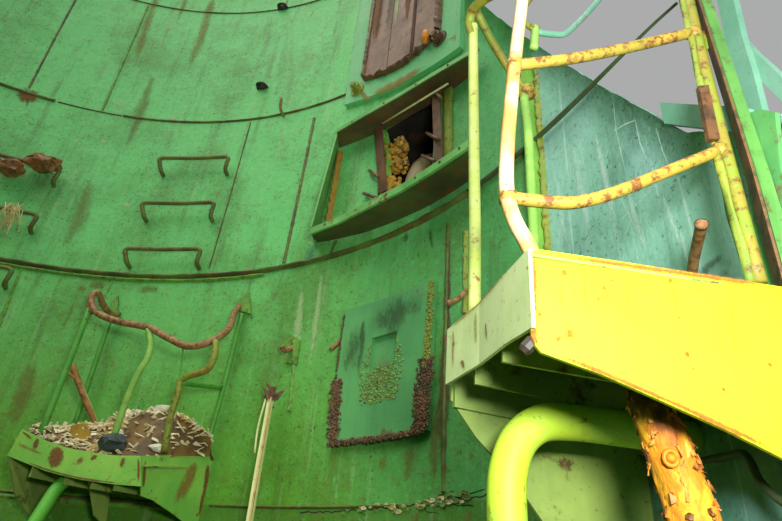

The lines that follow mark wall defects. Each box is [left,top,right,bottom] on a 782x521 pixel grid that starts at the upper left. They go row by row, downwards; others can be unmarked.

rust [17,89,37,102]
rust [565,255,760,285]
rust [531,260,542,344]
rust [563,356,770,448]
rust [31,447,114,483]
rust [177,464,209,514]